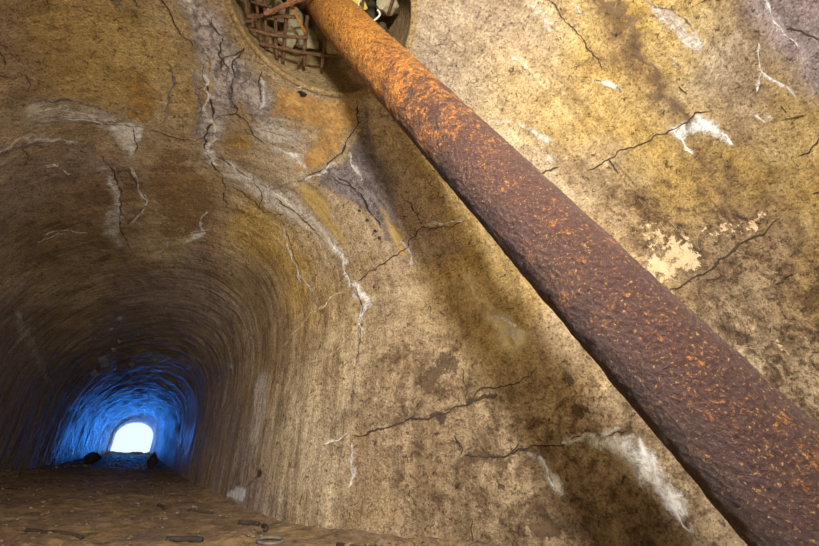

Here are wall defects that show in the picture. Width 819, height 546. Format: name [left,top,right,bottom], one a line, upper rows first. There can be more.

crack [0,0,463,383]
water stain [175,0,306,169]
water stain [219,162,337,250]
corrosion [276,90,352,170]
water stain [318,108,396,240]
corrosion [382,210,412,264]
crack [588,111,709,236]
flaking render [638,219,701,283]
flaking render [701,211,766,242]
crack [757,45,804,120]
crack [325,369,534,487]
water stain [580,436,692,531]